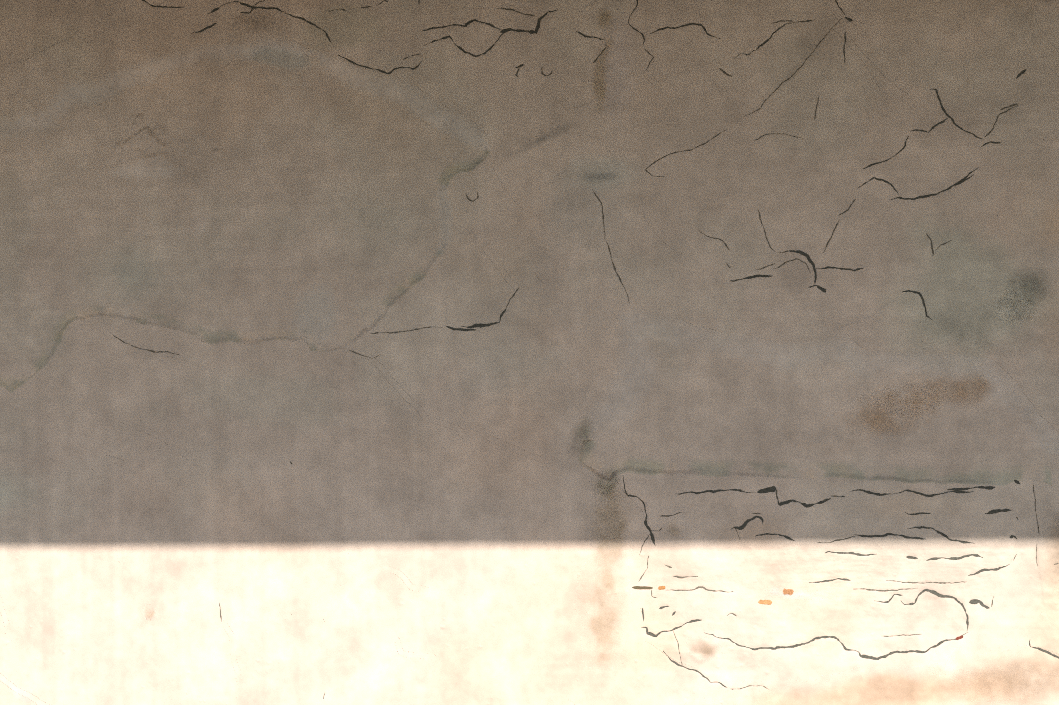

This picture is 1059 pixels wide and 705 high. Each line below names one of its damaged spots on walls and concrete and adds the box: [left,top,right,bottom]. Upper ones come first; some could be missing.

crack [628,0,853,177]
flaking render [115,113,173,180]
crack [592,189,630,304]
crack [701,89,1018,292]
crack [113,335,179,355]
crack [350,288,519,358]
crack [902,290,932,320]
flaking render [615,474,1017,670]